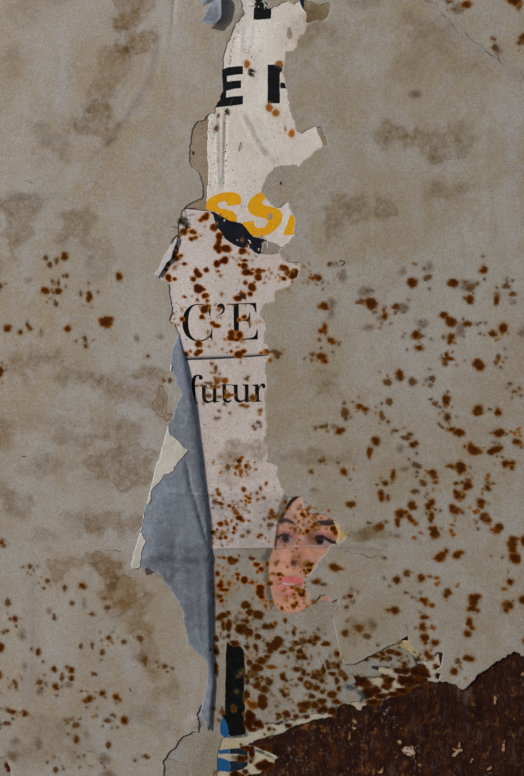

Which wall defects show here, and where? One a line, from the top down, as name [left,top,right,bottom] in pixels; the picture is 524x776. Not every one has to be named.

peeling [199,0,222,24]
peeling [304,0,331,23]
peeling [185,113,211,211]
peeling [248,240,284,254]
rust [164,212,329,363]
rust [447,255,488,305]
rust [439,312,509,371]
rust [312,391,524,614]
peeling [131,335,214,730]
rust [207,482,440,776]
rust [463,593,482,638]
peeling [397,740,424,767]